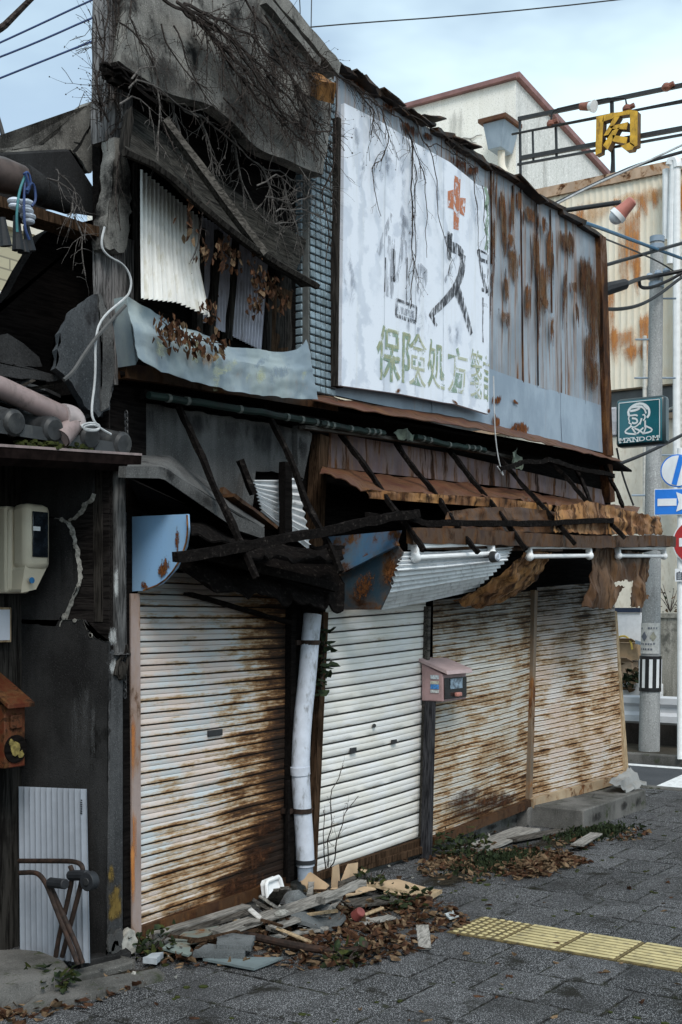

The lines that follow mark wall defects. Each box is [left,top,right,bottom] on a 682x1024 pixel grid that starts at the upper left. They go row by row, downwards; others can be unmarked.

corrosion [613,190,657,286]
corrosion [489,178,649,397]
corrosion [158,558,169,577]
corrosion [353,561,395,601]
corrosion [446,787,518,822]